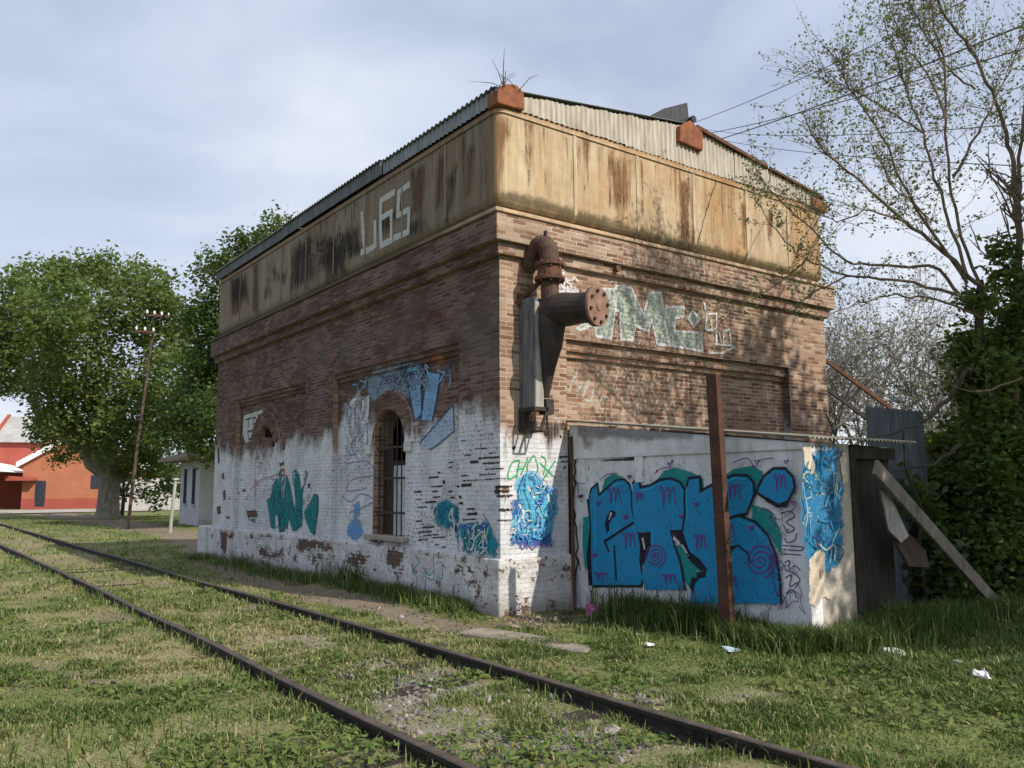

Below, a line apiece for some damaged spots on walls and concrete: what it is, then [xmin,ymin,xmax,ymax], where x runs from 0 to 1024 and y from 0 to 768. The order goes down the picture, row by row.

rust [608,152,628,221]
rust [670,169,694,240]
leakage [265,226,358,297]
peeling [803,446,816,475]
peeling [839,452,848,485]
peeling [217,447,230,553]
peeling [247,527,331,567]
peeling [346,540,405,576]
peeling [809,550,833,607]